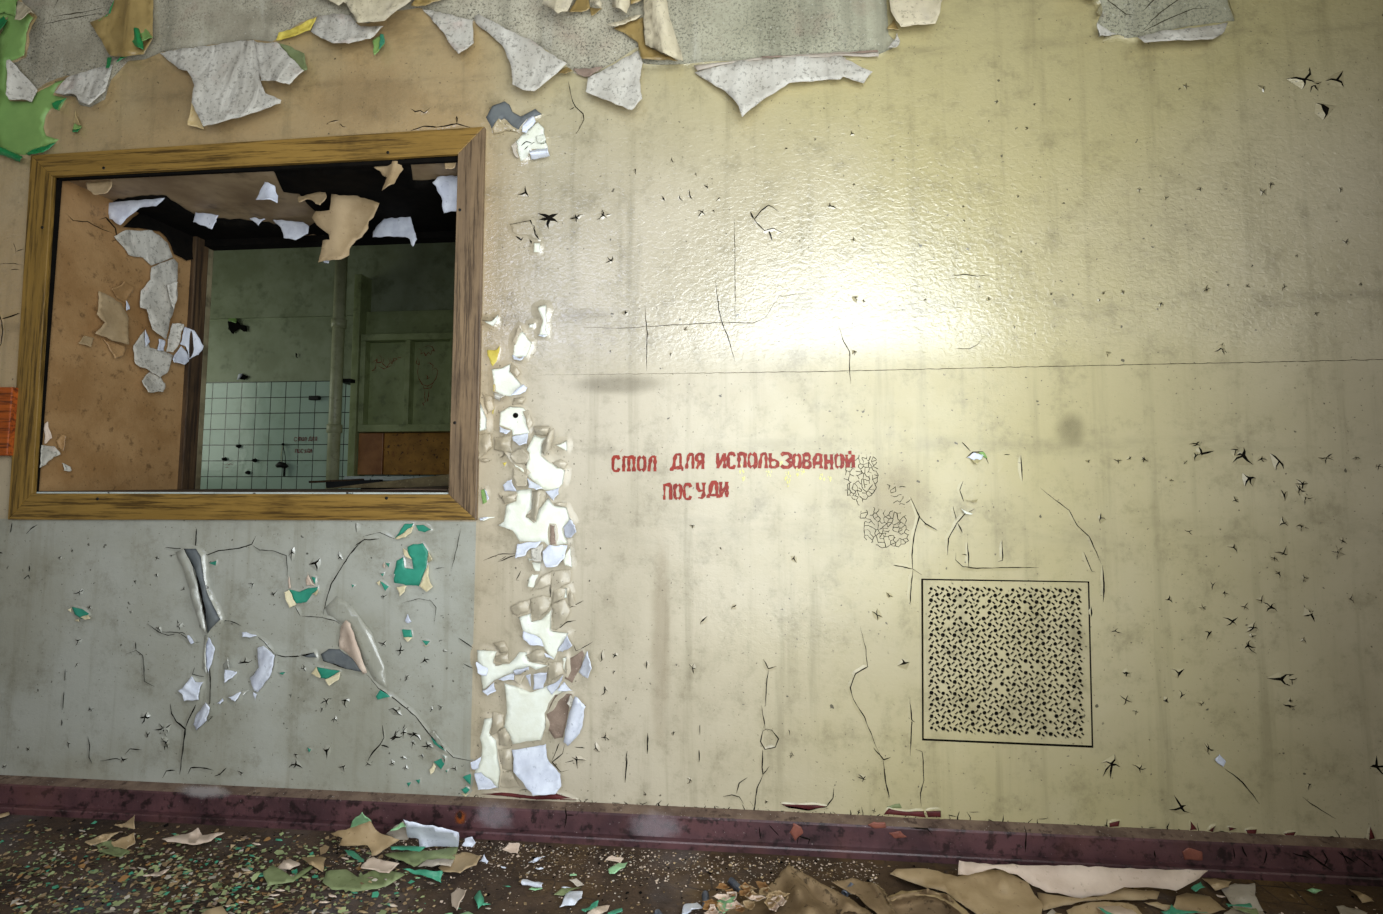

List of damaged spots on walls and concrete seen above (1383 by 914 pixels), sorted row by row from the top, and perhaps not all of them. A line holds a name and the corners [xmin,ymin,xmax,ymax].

peeling [0,0,942,166]
peeling [1091,0,1239,44]
peeling [72,161,457,393]
crack [585,203,1383,381]
peeling [40,422,72,471]
peeling [175,629,288,735]
crack [59,523,473,779]
peeling [405,299,754,810]
crack [571,724,700,796]
crack [723,442,1121,844]
crack [1101,754,1147,779]
crack [1085,441,1383,715]